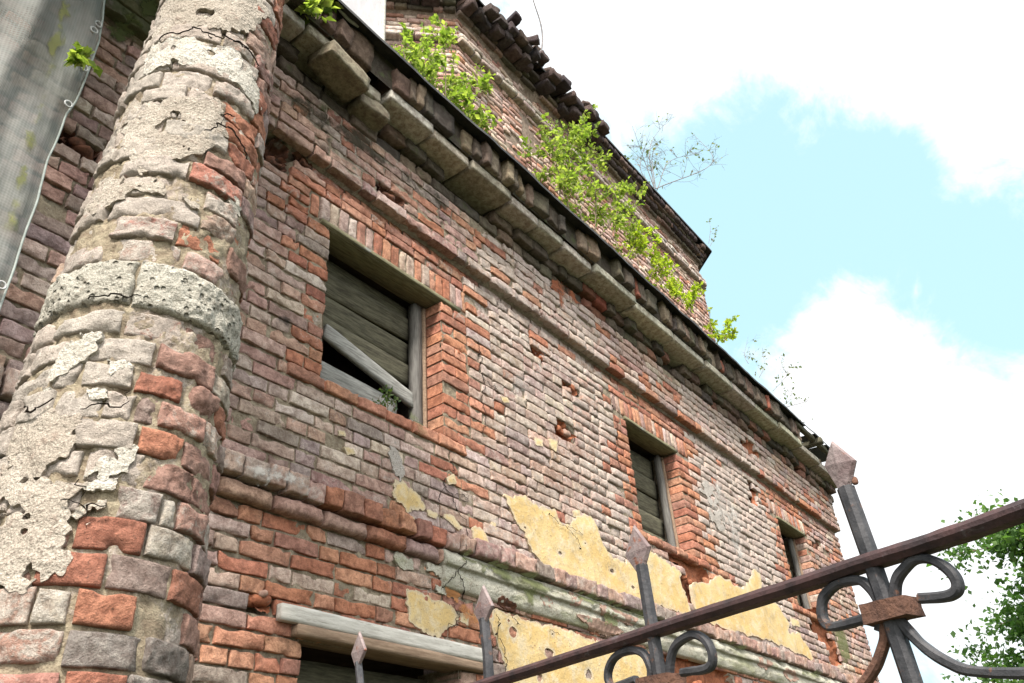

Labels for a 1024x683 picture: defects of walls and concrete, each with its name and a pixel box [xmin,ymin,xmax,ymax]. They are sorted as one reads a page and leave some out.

crack [158,26,259,67]
crack [205,113,248,160]
crack [88,292,141,300]
peeling [107,359,132,376]
peeling [86,387,109,401]
spalling [554,420,576,444]
peeling [83,478,118,513]
spalling [668,551,709,604]
flaking render [497,596,517,613]
flaking render [568,589,638,637]
spalling [663,655,732,683]